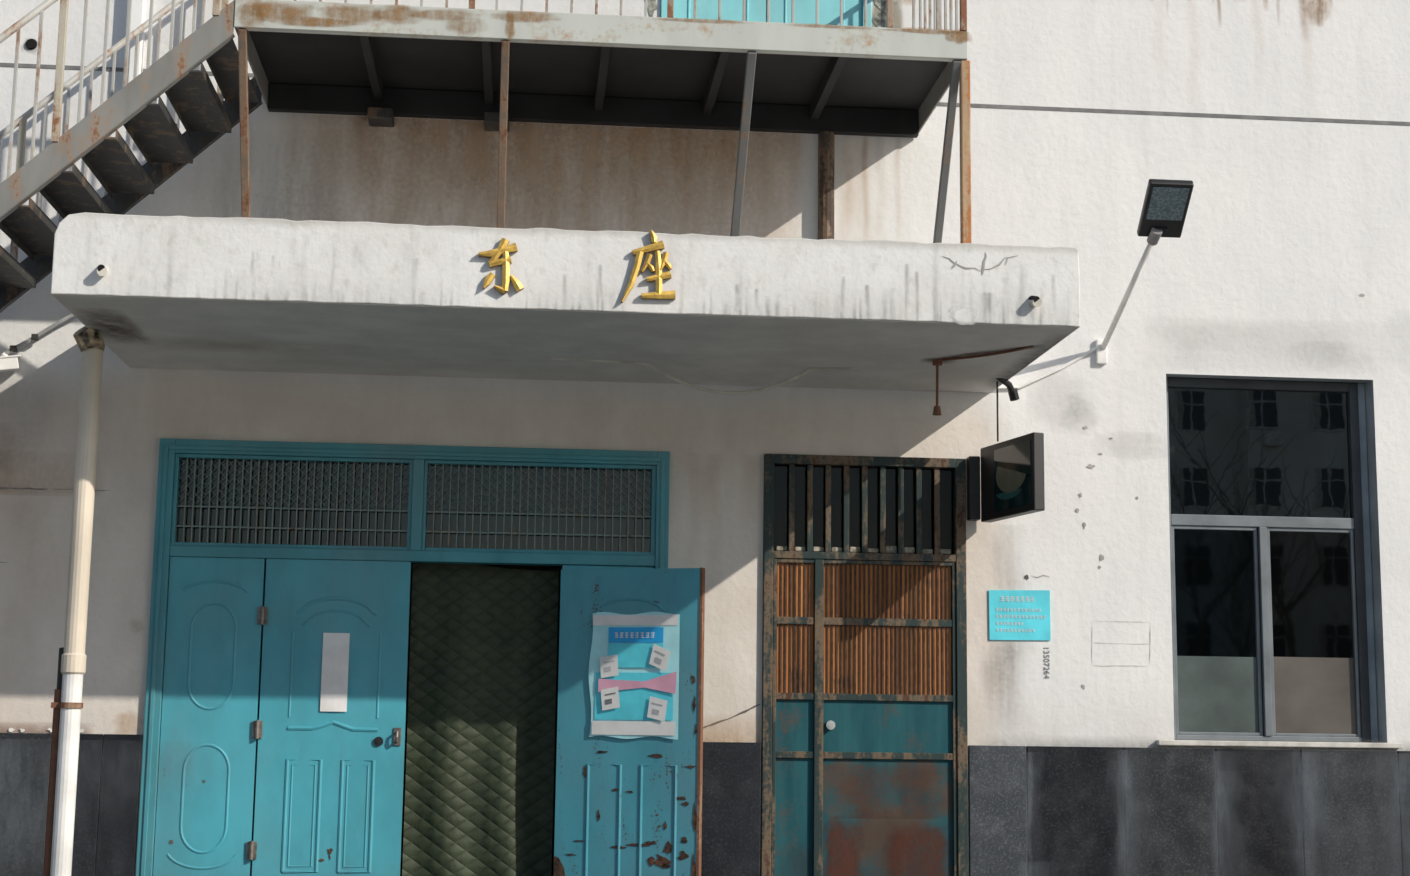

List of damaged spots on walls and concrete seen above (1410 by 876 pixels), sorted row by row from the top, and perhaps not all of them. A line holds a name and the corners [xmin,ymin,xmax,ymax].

rust [244,4,428,26]
rust [507,13,542,38]
rust [904,28,969,42]
crack [943,252,1018,275]
spalling [611,796,697,876]
spalling [553,840,585,876]